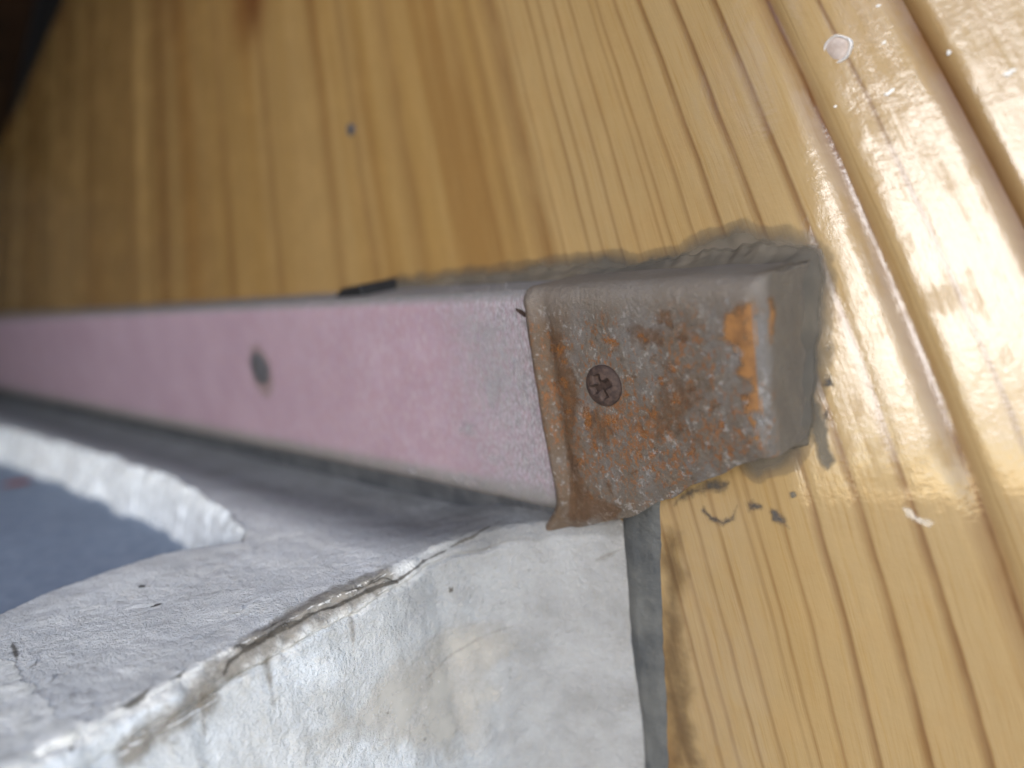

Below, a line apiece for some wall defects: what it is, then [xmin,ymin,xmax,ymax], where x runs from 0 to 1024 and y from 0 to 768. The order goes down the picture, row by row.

spalling [0,427,247,614]
corrosion [551,335,620,521]
corrosion [724,298,775,440]
crack [118,671,184,708]